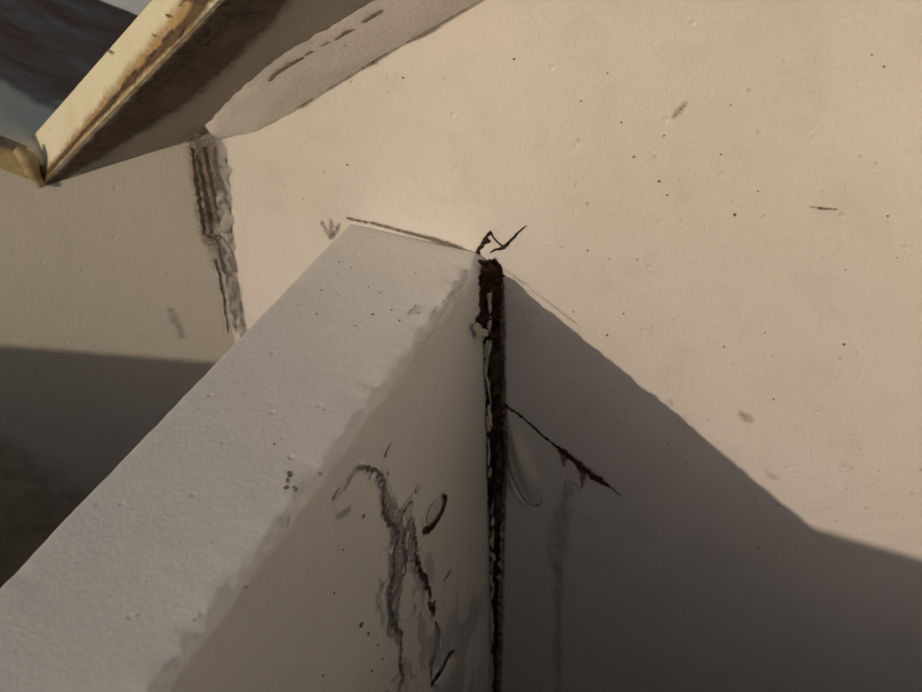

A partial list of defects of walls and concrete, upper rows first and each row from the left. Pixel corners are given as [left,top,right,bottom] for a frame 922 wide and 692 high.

rust [41,0,287,181]
crack [190,146,229,333]
crack [347,218,526,255]
rust [478,259,505,511]
crack [504,404,621,496]
peeling [332,440,490,692]